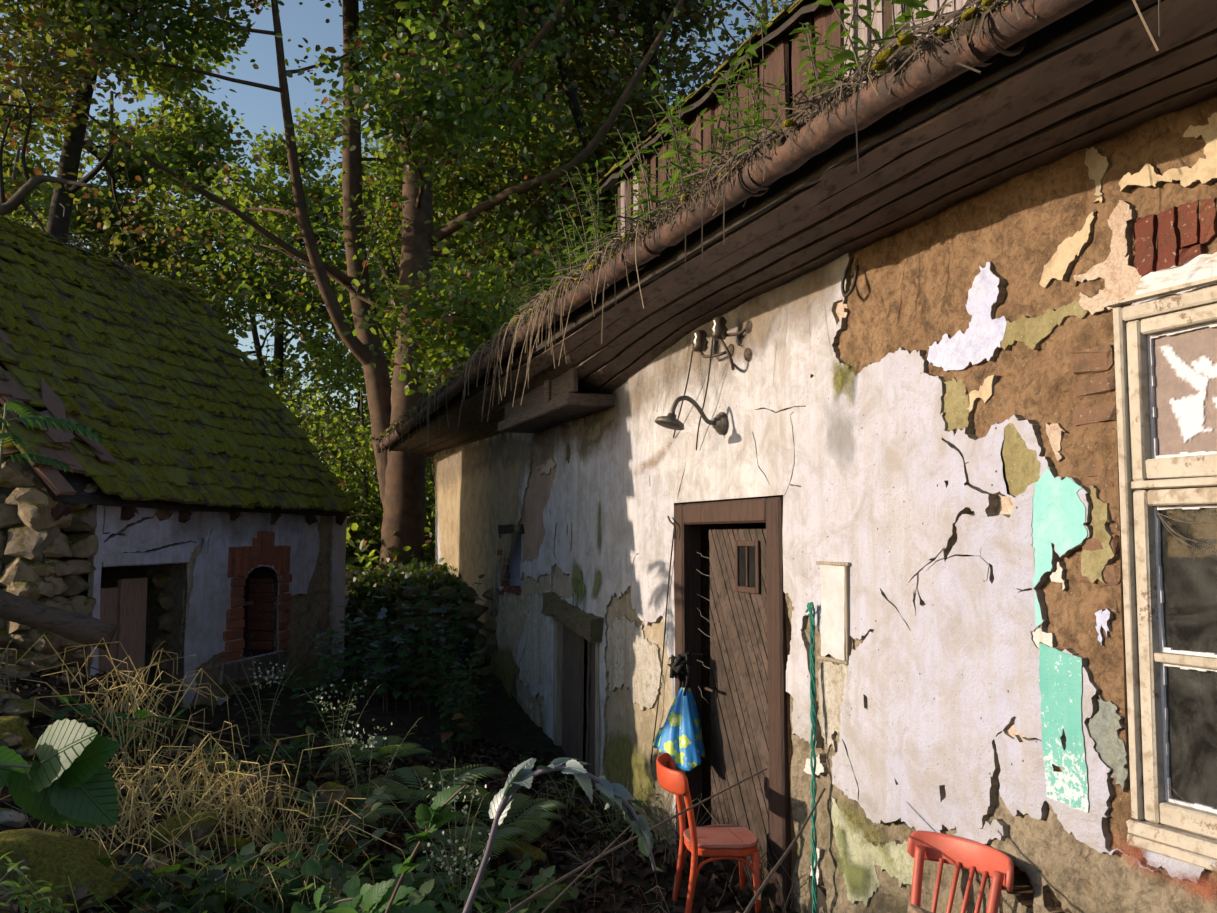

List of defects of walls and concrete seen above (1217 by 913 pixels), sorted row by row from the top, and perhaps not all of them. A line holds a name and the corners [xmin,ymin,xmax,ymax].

crack [103,517,190,553]
flaking render [489,433,575,727]
flaking render [606,586,675,840]
flaking render [785,96,1217,913]